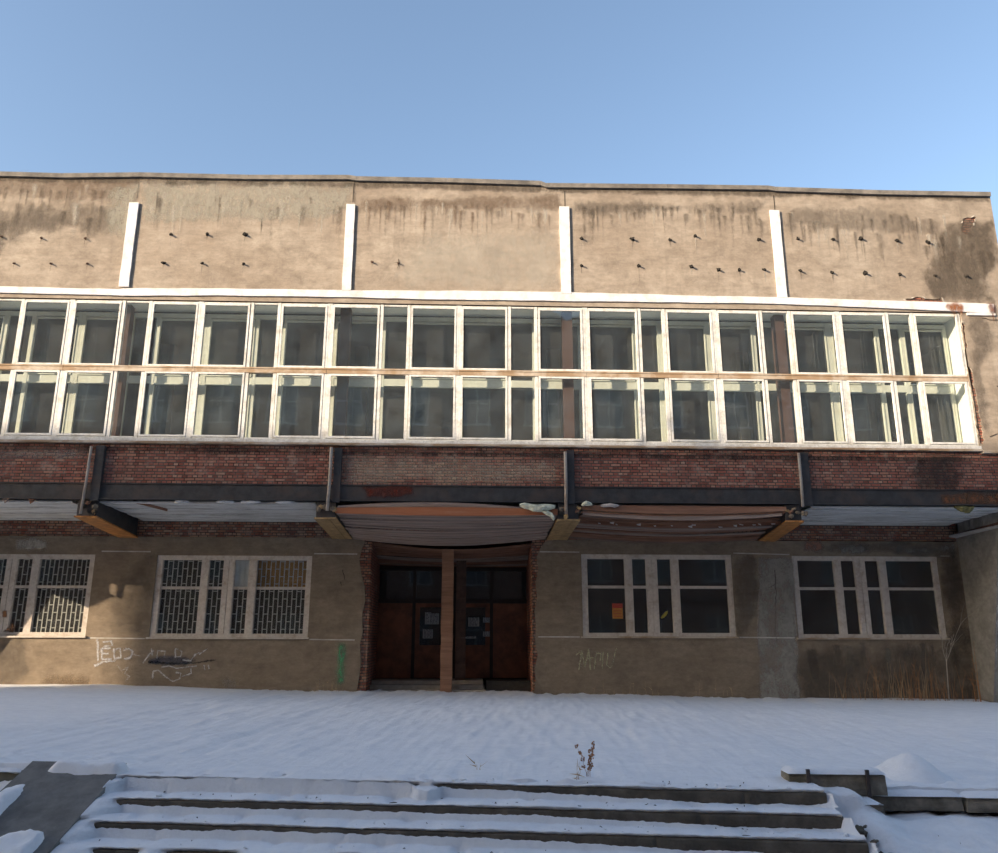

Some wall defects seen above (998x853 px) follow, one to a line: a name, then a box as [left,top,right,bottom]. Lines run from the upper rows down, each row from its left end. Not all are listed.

leakage [0,183,351,240]
leakage [925,220,995,300]